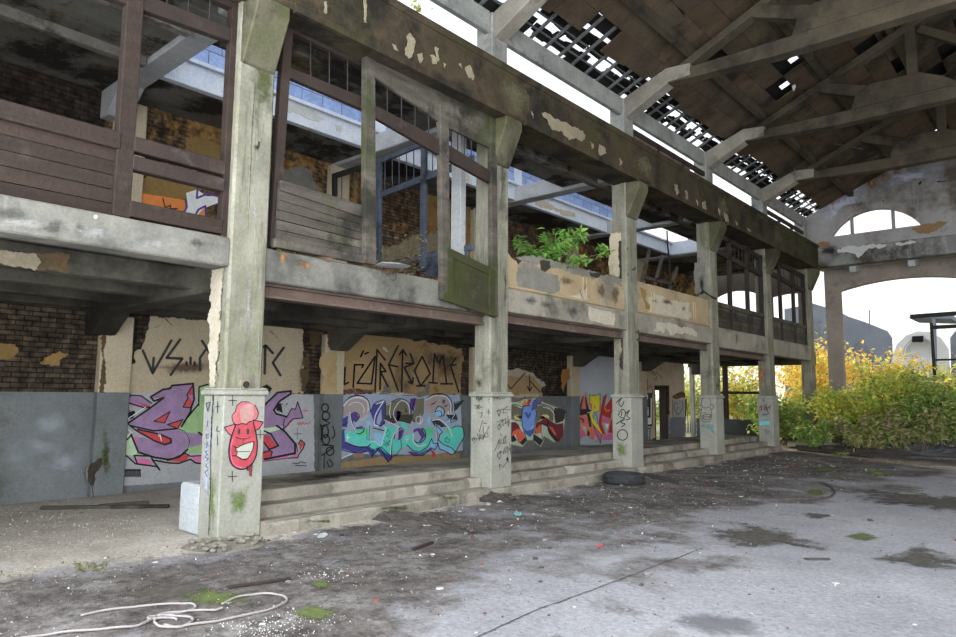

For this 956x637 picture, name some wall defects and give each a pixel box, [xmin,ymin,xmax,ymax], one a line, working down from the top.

peeling [392,33,446,68]
peeling [531,111,606,156]
peeling [816,221,948,258]
peeling [36,252,70,273]
spalling [540,260,551,272]
spalling [207,268,224,388]
peeling [647,295,697,337]
spalling [85,458,103,487]